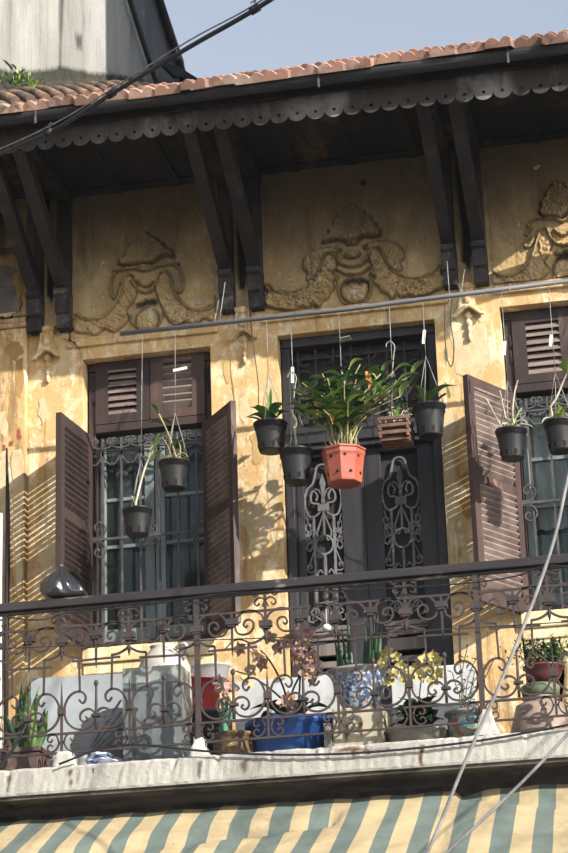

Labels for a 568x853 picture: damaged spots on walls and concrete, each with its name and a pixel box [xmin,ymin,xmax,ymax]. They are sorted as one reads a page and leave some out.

peeling [450,310,490,412]
peeling [444,407,471,564]
rust [341,722,372,755]